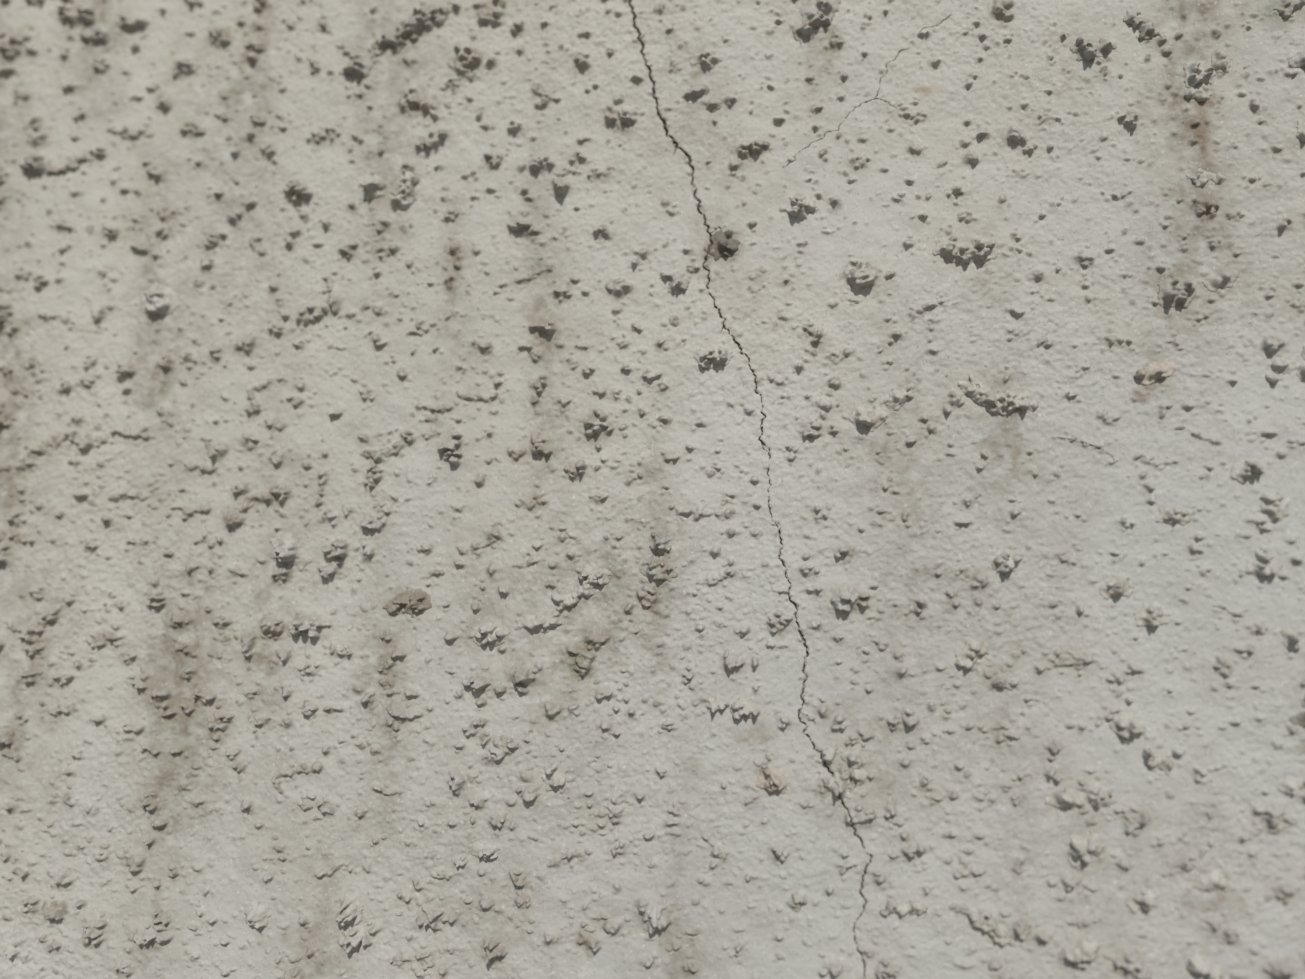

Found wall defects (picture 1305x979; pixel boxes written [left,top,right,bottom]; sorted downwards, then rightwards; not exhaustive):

crack [629,0,872,977]
crack [782,15,950,168]